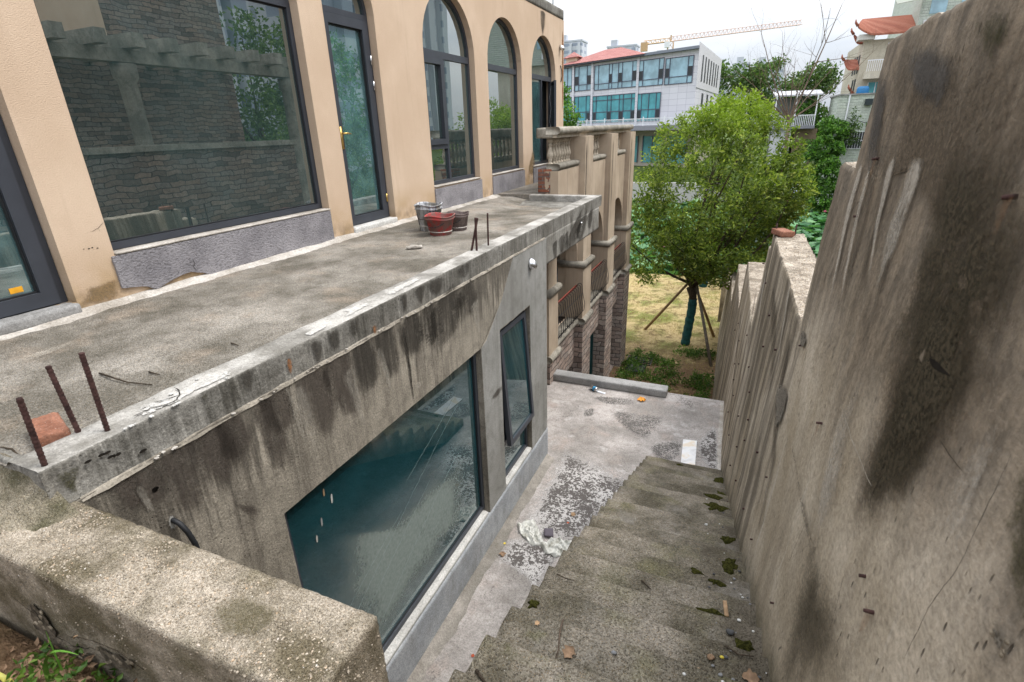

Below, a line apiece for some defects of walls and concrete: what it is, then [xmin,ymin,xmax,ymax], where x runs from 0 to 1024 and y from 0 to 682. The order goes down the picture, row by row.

water stain [116,415,250,507]
spalling [80,237,545,502]
water stain [834,17,1024,510]